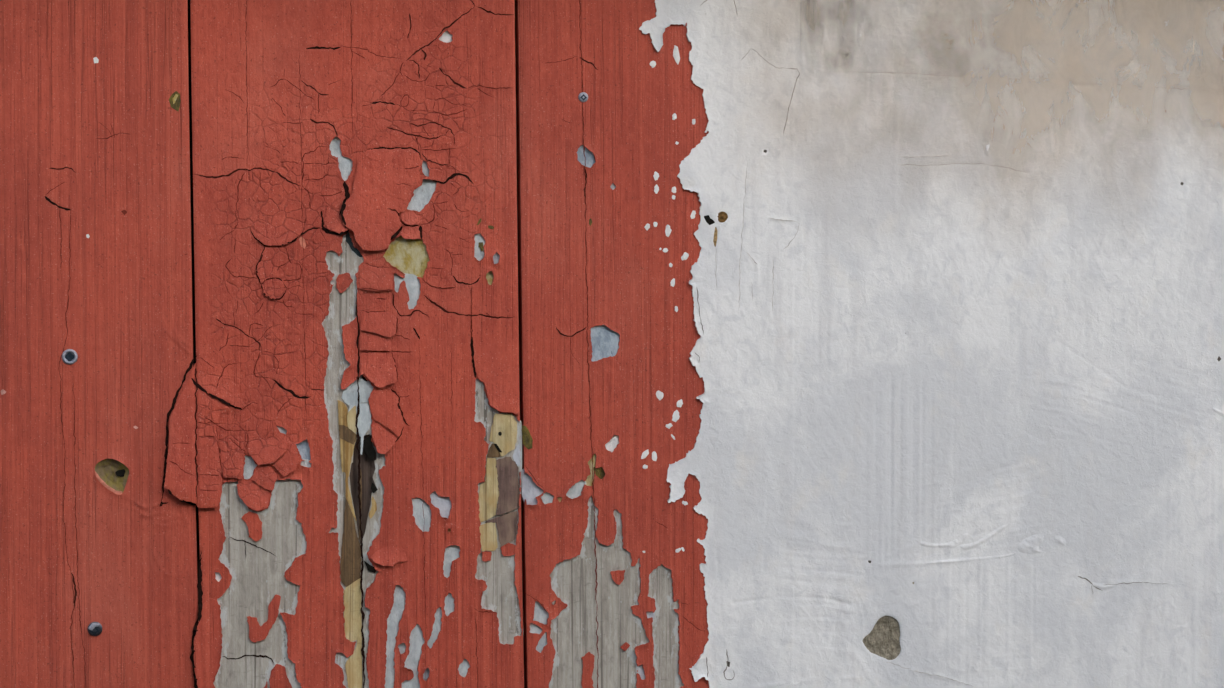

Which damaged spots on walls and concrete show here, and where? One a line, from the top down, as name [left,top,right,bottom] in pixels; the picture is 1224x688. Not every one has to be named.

peeling [577,145,595,168]
peeling [247,215,310,299]
peeling [474,219,500,285]
spalling [704,211,728,247]
crack [160,0,514,688]
peeling [591,325,620,362]
peeling [322,137,436,688]
peeling [194,426,311,688]
peeling [412,491,460,578]
peeling [474,340,684,688]
peeling [384,585,454,688]
spalling [863,616,901,660]